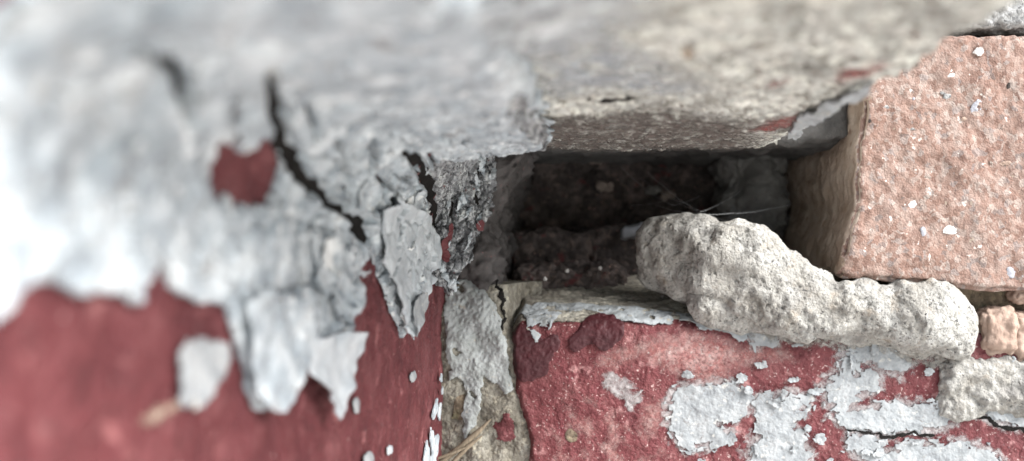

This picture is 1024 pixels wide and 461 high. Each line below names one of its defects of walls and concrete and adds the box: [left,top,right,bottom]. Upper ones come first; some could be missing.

peeling [0,0,555,461]
crack [266,73,367,244]
crack [402,150,480,243]
crack [495,279,507,330]
peeling [514,302,1008,461]
peeling [982,411,1024,432]